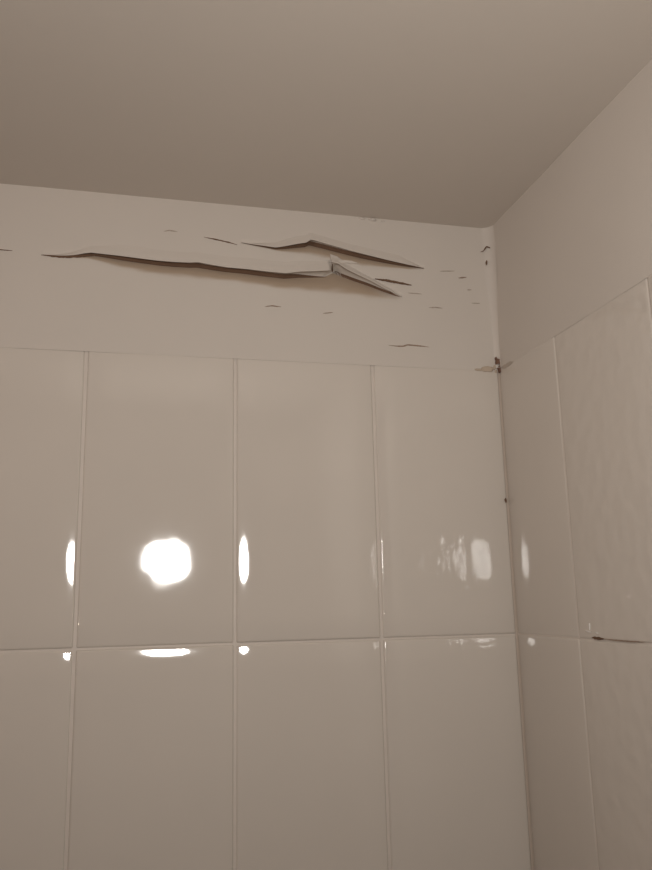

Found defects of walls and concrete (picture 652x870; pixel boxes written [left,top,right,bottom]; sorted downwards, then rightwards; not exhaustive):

peeling [43,233,424,301]